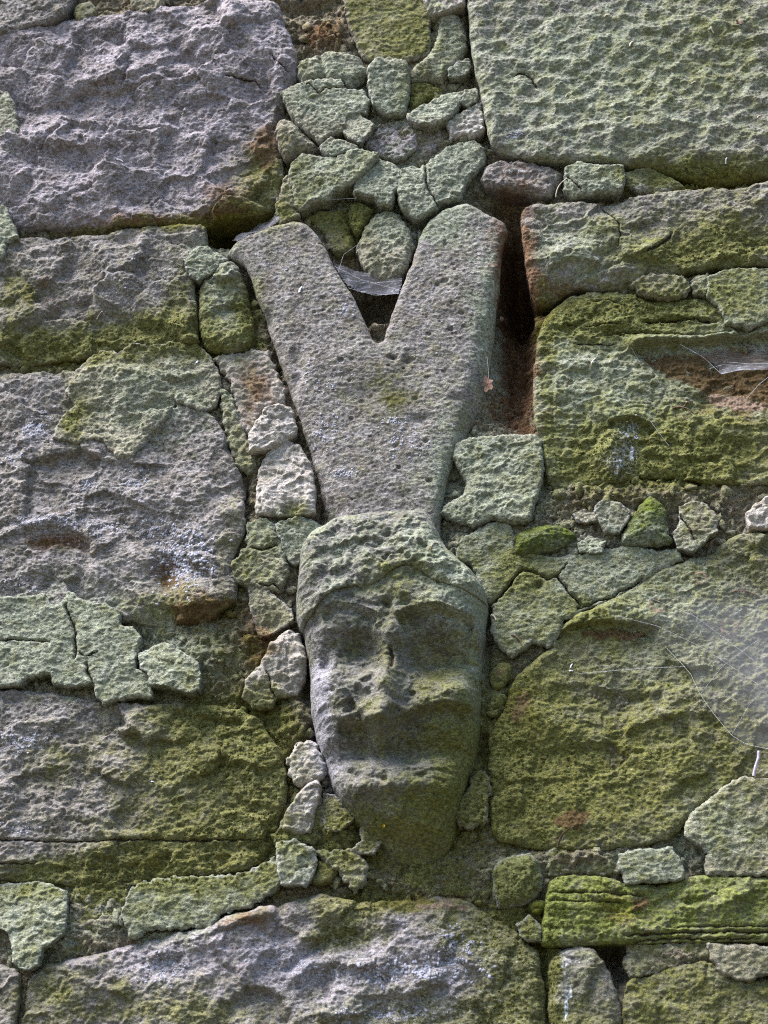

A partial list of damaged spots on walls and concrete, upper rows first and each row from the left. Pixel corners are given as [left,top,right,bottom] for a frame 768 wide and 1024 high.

crack [66,607,95,684]